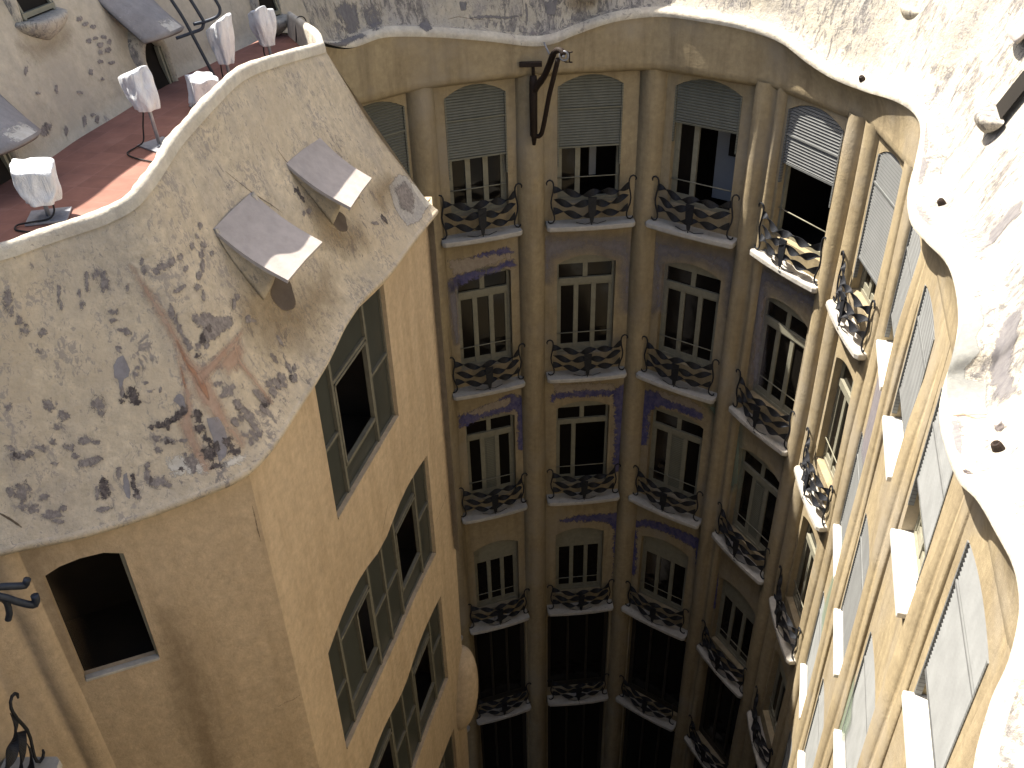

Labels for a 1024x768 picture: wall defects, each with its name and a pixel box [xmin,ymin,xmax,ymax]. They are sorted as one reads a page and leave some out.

peeling [394,181,430,214]
peeling [2,289,48,355]
peeling [77,268,110,311]
spalling [108,309,162,406]
spalling [3,335,298,513]
peeling [0,479,67,526]